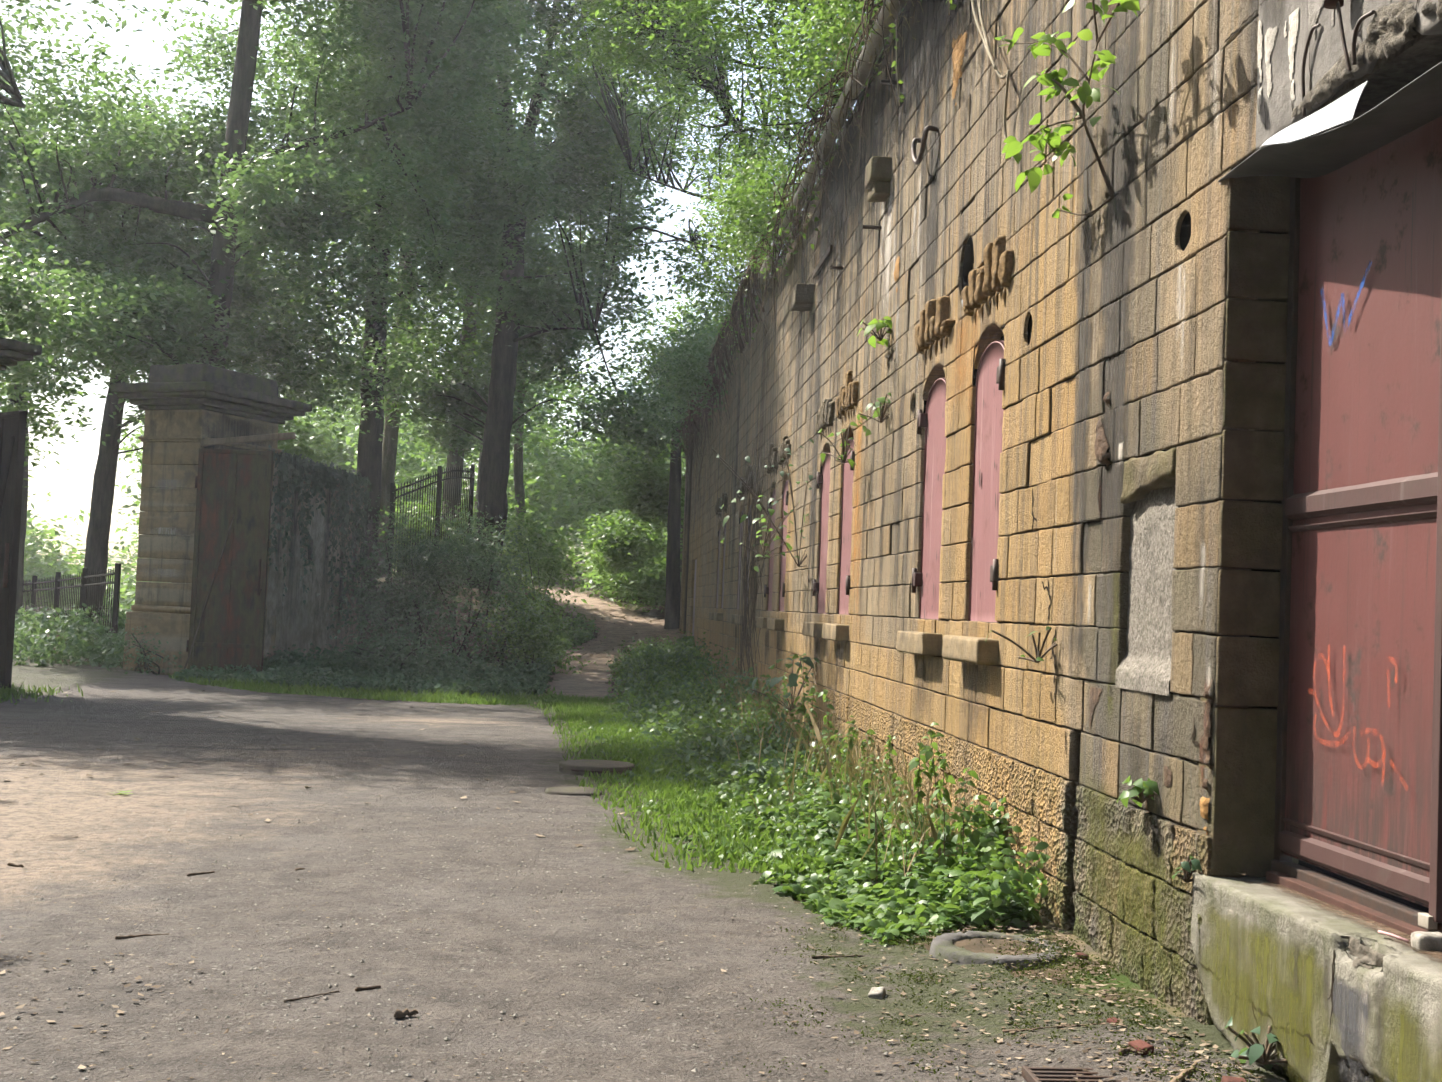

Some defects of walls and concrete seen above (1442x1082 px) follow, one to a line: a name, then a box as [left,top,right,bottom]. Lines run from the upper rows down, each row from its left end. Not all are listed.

leakage [1205,912,1300,1067]
leakage [1341,1029,1371,1080]